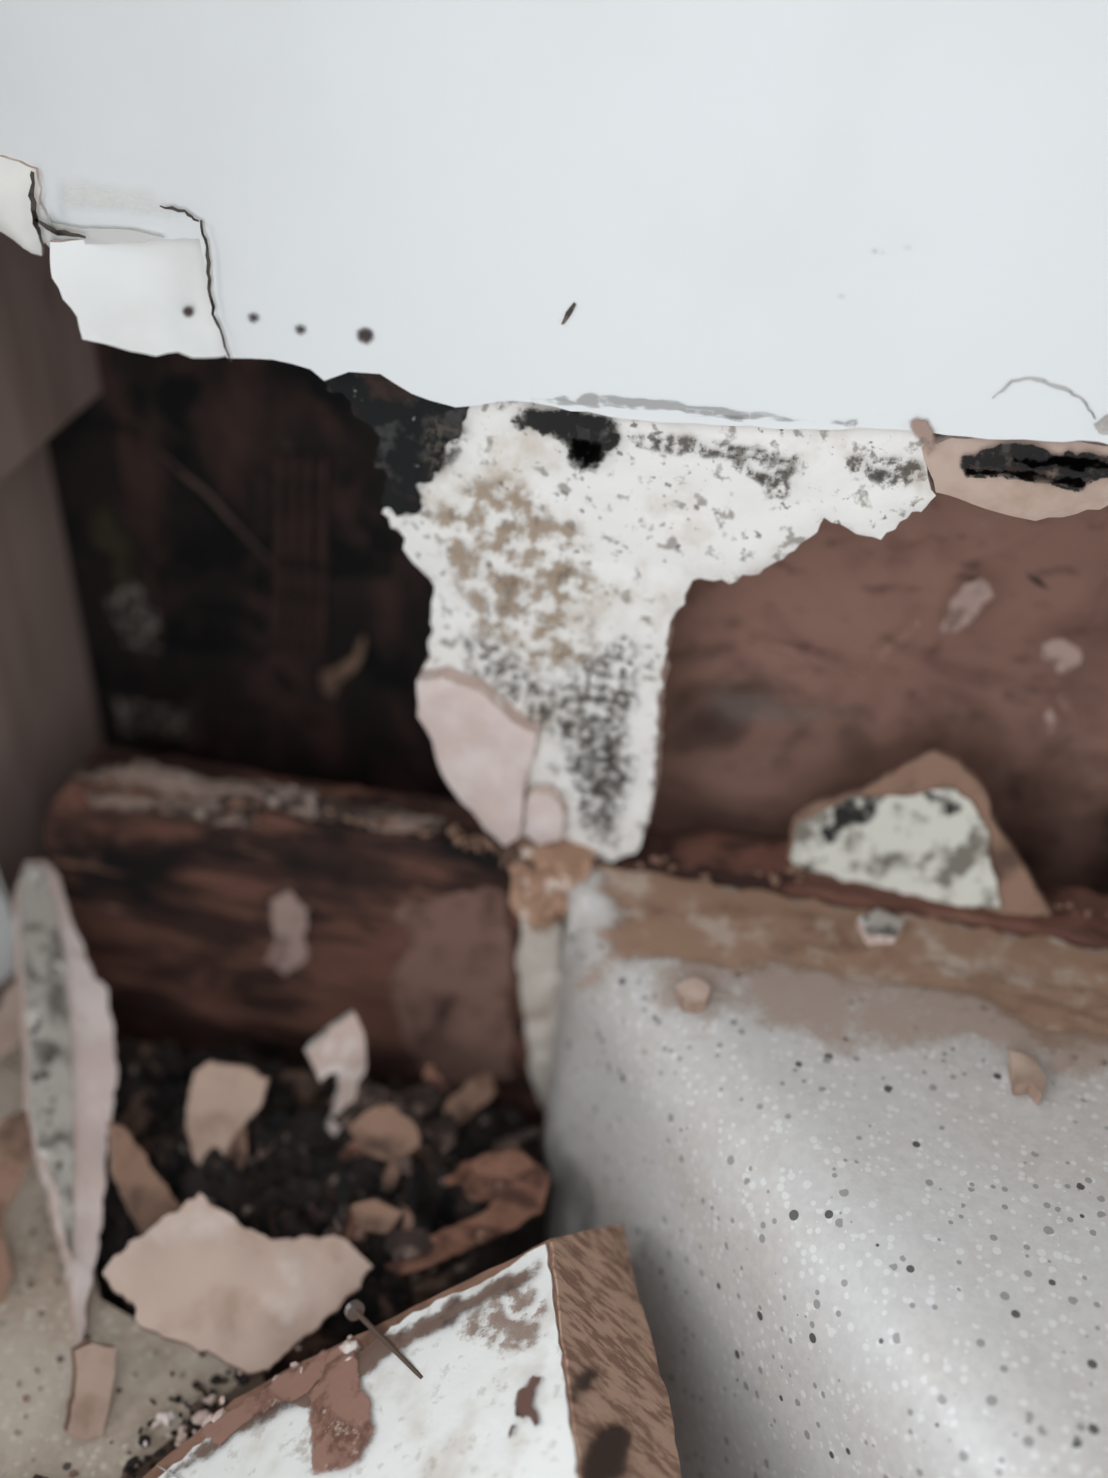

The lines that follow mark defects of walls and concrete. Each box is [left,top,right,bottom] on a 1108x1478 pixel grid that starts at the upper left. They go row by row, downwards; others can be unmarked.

spalling [0,155,567,847]
leakage [424,418,465,476]
mould [511,408,798,498]
mould [850,456,921,486]
spalling [911,415,1108,521]
mould [960,443,1108,492]
mould [436,482,635,843]
spalling [857,908,905,945]
peeling [0,983,22,1058]
peeling [389,886,516,1091]
spalling [675,977,711,1013]